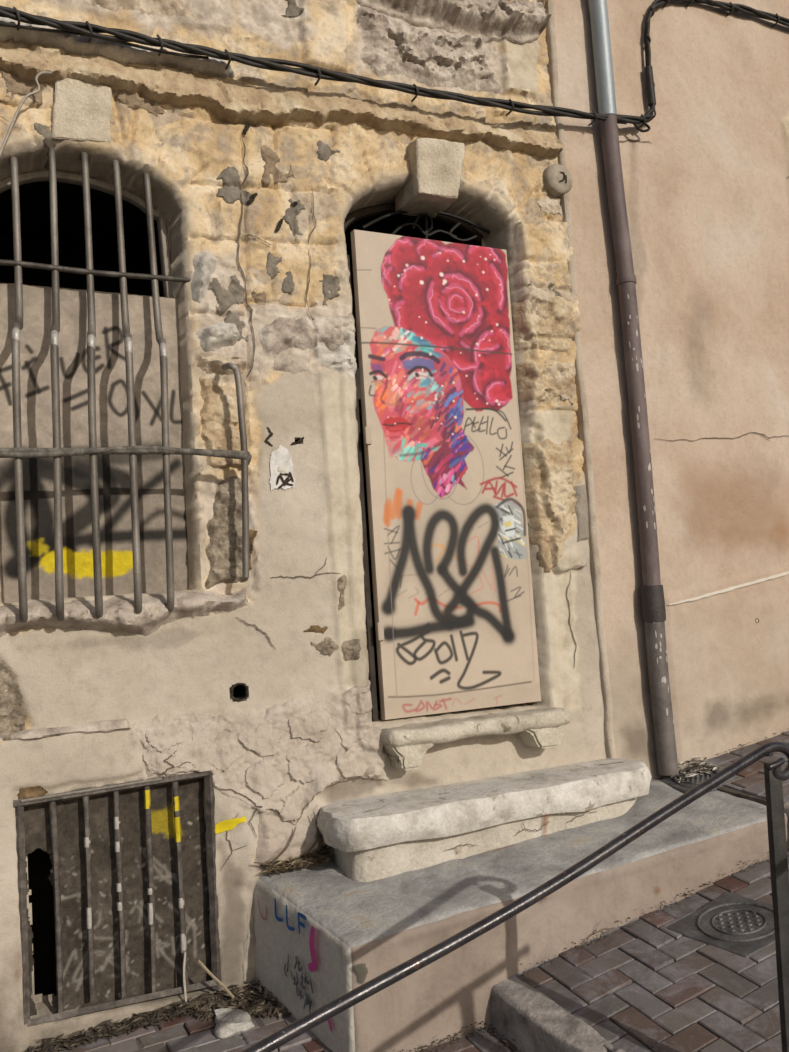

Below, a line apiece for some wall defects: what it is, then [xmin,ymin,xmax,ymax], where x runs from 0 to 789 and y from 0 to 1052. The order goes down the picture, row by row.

crack [655,432,787,441]
spalling [198,376,258,589]
crack [271,557,340,579]
spalling [337,575,347,611]
crack [566,571,577,668]
spalling [303,625,361,661]
spalling [0,660,26,741]
crack [161,751,194,779]
crack [213,777,388,871]